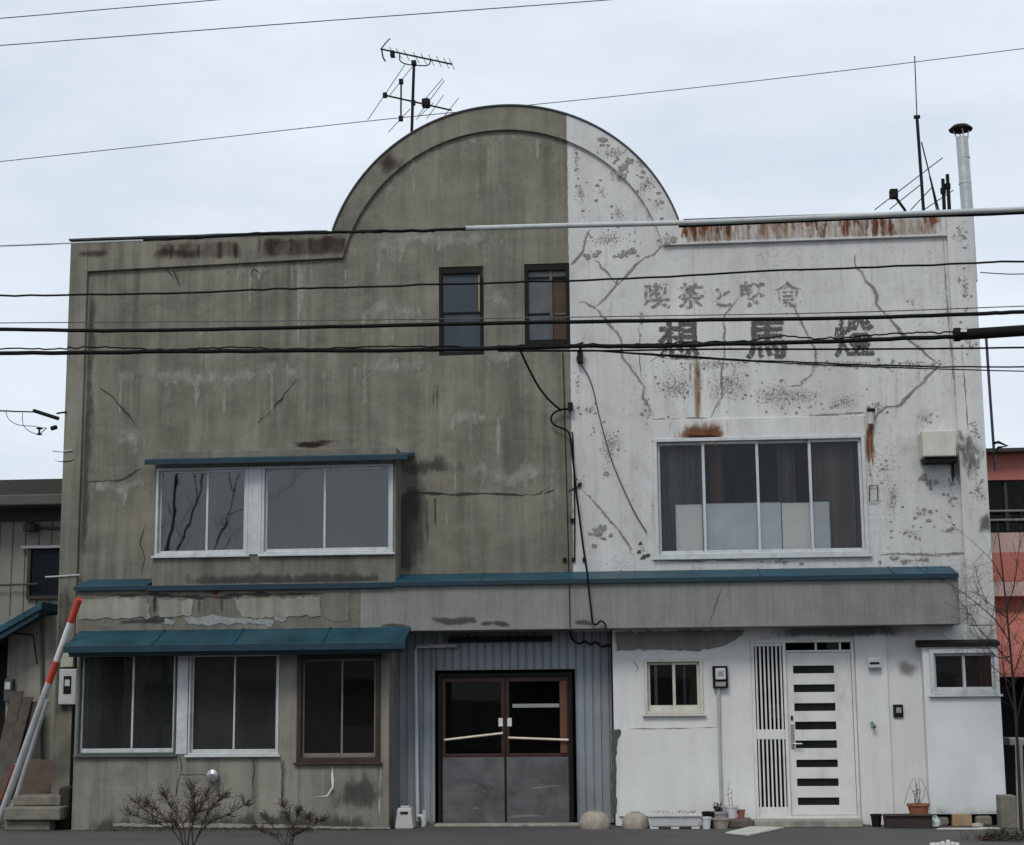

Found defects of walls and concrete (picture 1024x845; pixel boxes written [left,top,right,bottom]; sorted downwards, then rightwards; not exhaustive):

peeling [574,137,664,260]
rust [267,236,342,255]
rust [682,226,730,241]
rust [842,219,894,236]
crack [571,229,739,420]
crack [788,238,968,426]
crack [100,388,141,430]
rust [683,361,720,438]
rust [866,424,874,463]
crack [401,486,752,562]
crack [881,550,963,558]
spalling [77,589,350,627]